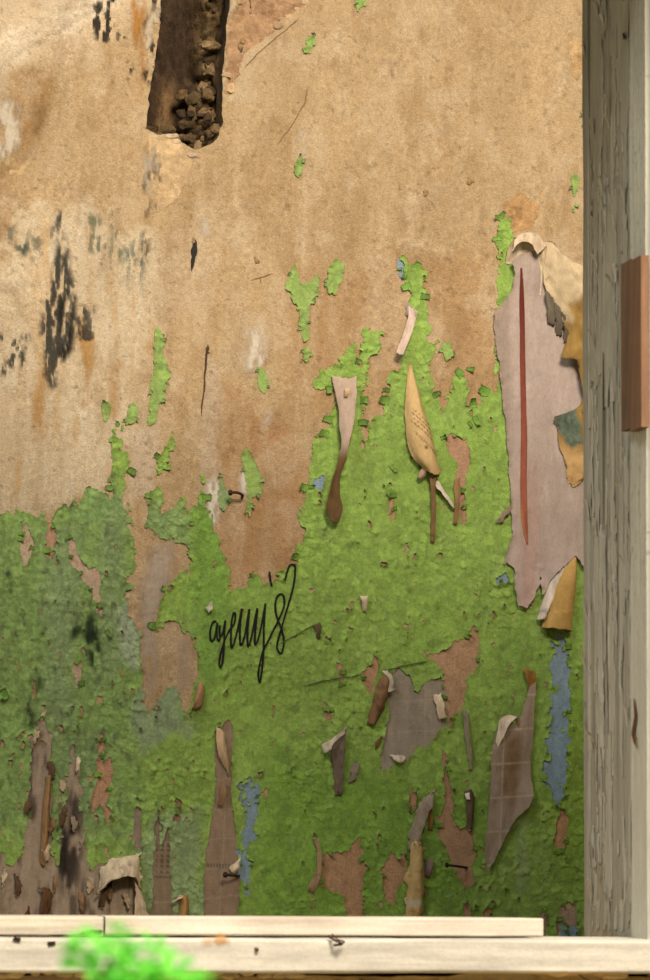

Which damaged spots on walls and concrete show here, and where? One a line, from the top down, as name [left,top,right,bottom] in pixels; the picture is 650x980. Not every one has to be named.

spalling [221,0,309,96]
peeling [302,31,316,54]
spalling [569,40,585,80]
spalling [148,133,198,210]
peeling [294,153,306,178]
peeling [569,174,580,212]
peeling [491,193,540,308]
peeling [584,0,637,932]
peeling [0,255,594,937]